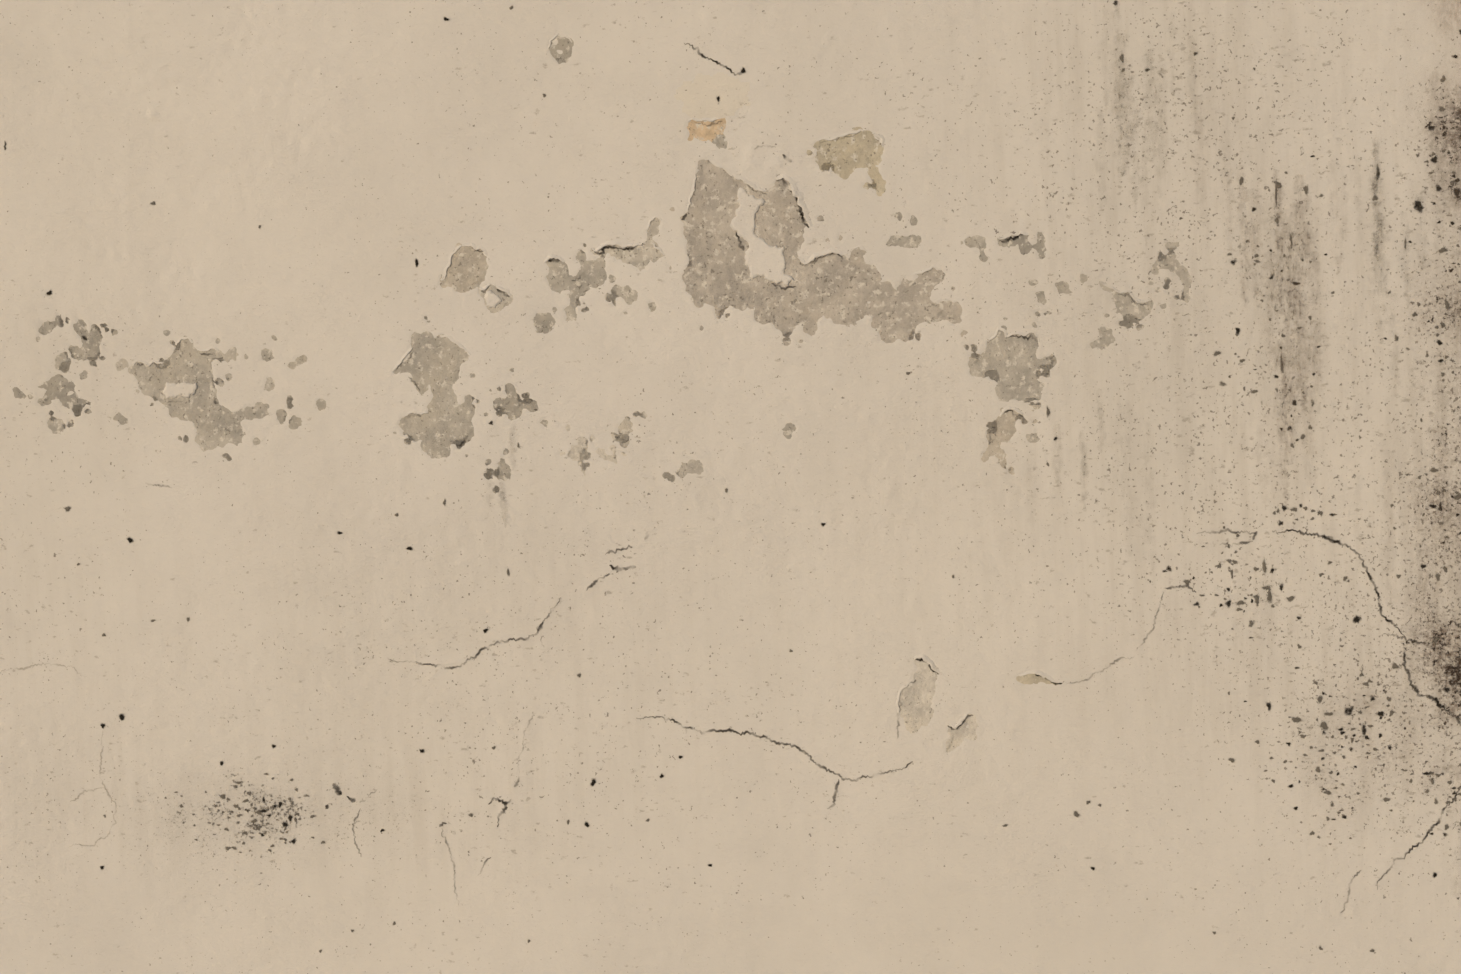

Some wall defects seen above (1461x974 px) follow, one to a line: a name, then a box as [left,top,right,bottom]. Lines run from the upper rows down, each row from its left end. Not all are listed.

peeling [440,243,513,313]
peeling [534,117,1192,476]
water stain [1214,172,1327,448]
water stain [1406,76,1461,381]
peeling [12,314,307,461]
peeling [392,316,548,459]
water stain [1149,526,1301,638]
crack [1233,529,1460,723]
water stain [1255,397,1461,845]
water stain [164,761,338,858]
crack [643,716,910,802]
crack [1354,786,1461,889]